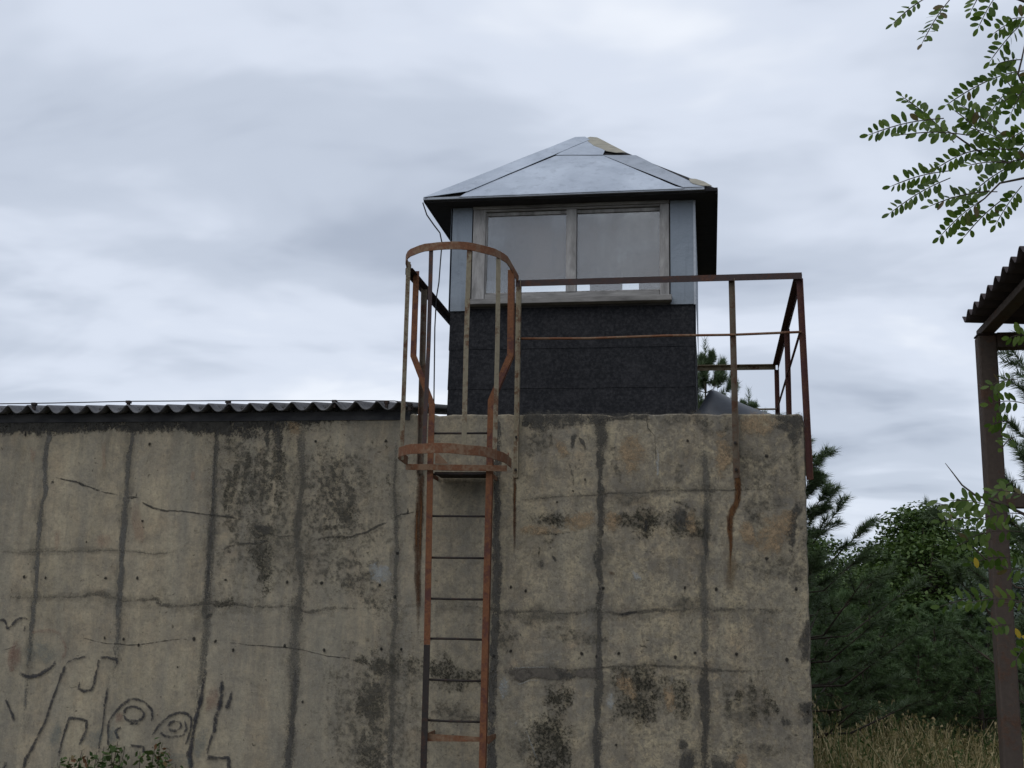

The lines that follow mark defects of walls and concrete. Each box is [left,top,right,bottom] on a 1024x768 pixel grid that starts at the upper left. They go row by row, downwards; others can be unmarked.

water stain [0,405,373,514]
crack [51,478,290,550]
crack [318,510,413,540]
corrosion [414,475,424,614]
water stain [616,495,710,540]
corrosion [727,478,741,571]
crack [246,644,346,658]
water stain [355,653,481,725]
water stain [518,685,575,768]
water stain [612,663,690,725]